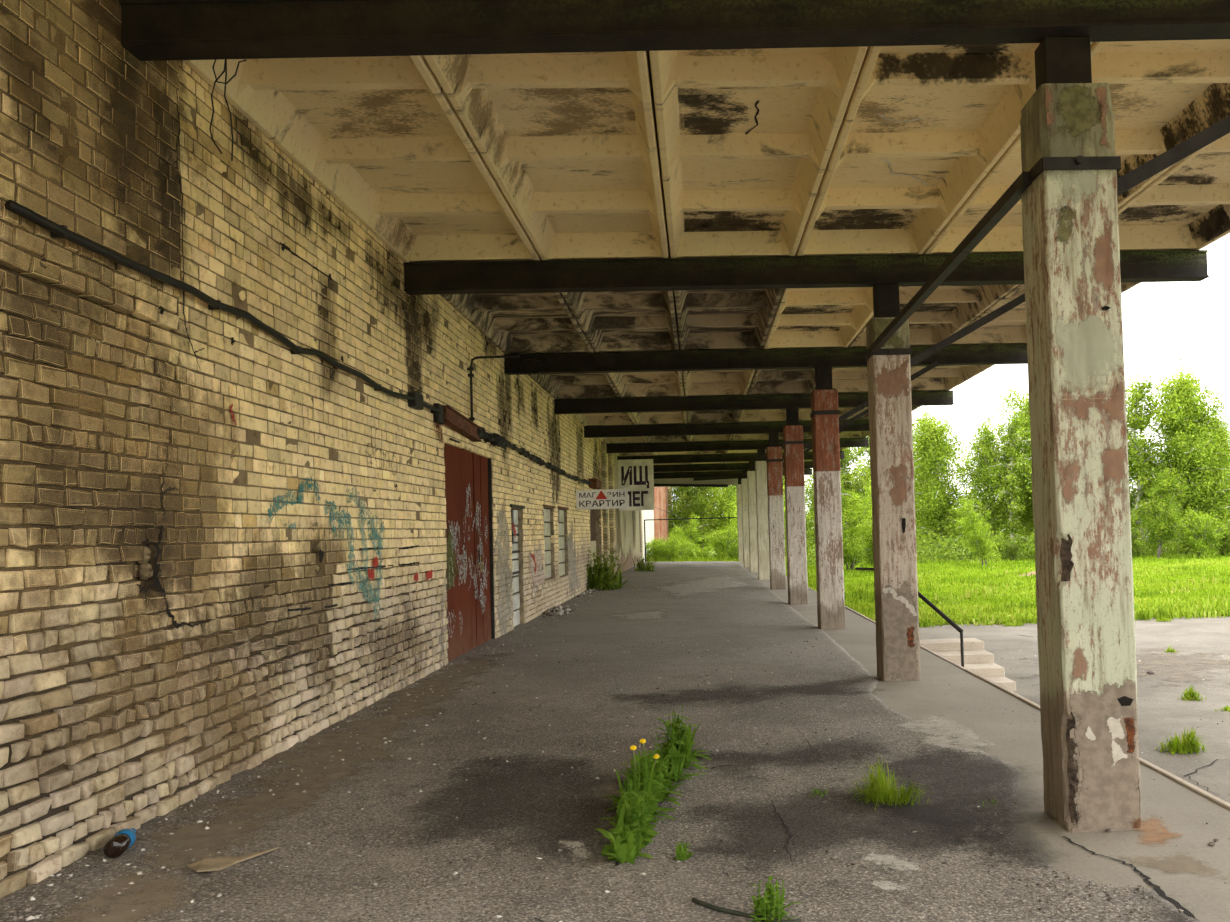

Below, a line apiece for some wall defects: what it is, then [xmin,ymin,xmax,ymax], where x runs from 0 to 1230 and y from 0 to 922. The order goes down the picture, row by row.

damp [877,44,1028,84]
damp [678,89,747,135]
crack [746,101,759,134]
damp [684,211,785,232]
damp [813,209,915,230]
peeling [1089,220,1114,291]
peeling [1061,367,1126,498]
crack [137,459,211,629]
spalling [1060,534,1074,581]
peeling [1066,648,1141,830]
crack [772,803,804,865]
crack [1063,836,1199,921]